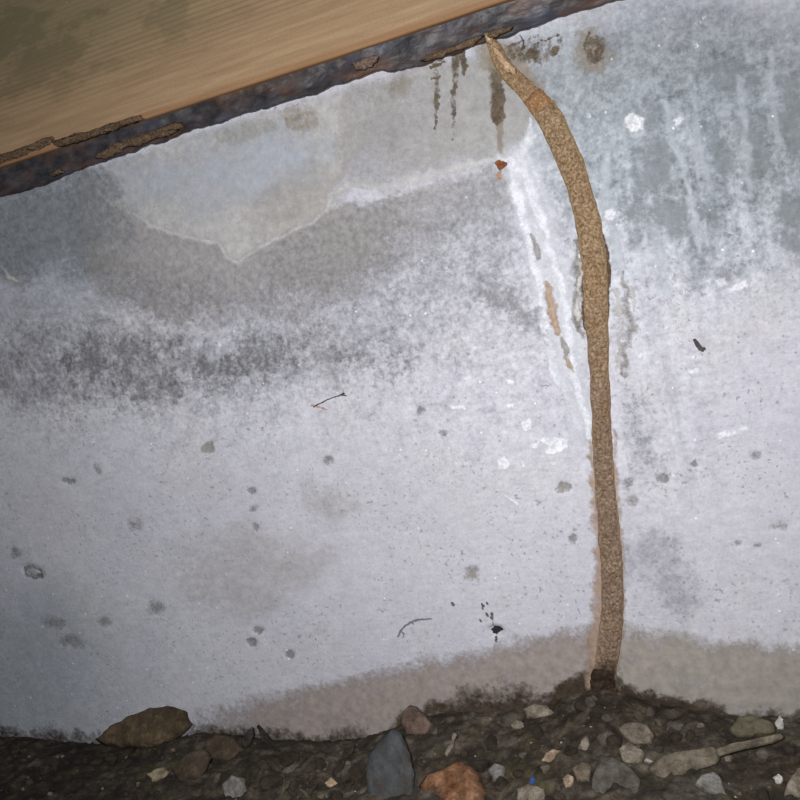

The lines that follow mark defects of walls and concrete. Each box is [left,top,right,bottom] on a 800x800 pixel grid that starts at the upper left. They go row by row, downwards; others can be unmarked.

damp [499,34,562,87]
damp [580,32,607,70]
rust [495,160,507,179]
damp [631,100,717,296]
damp [0,44,592,442]
damp [211,630,598,741]
damp [617,630,800,718]